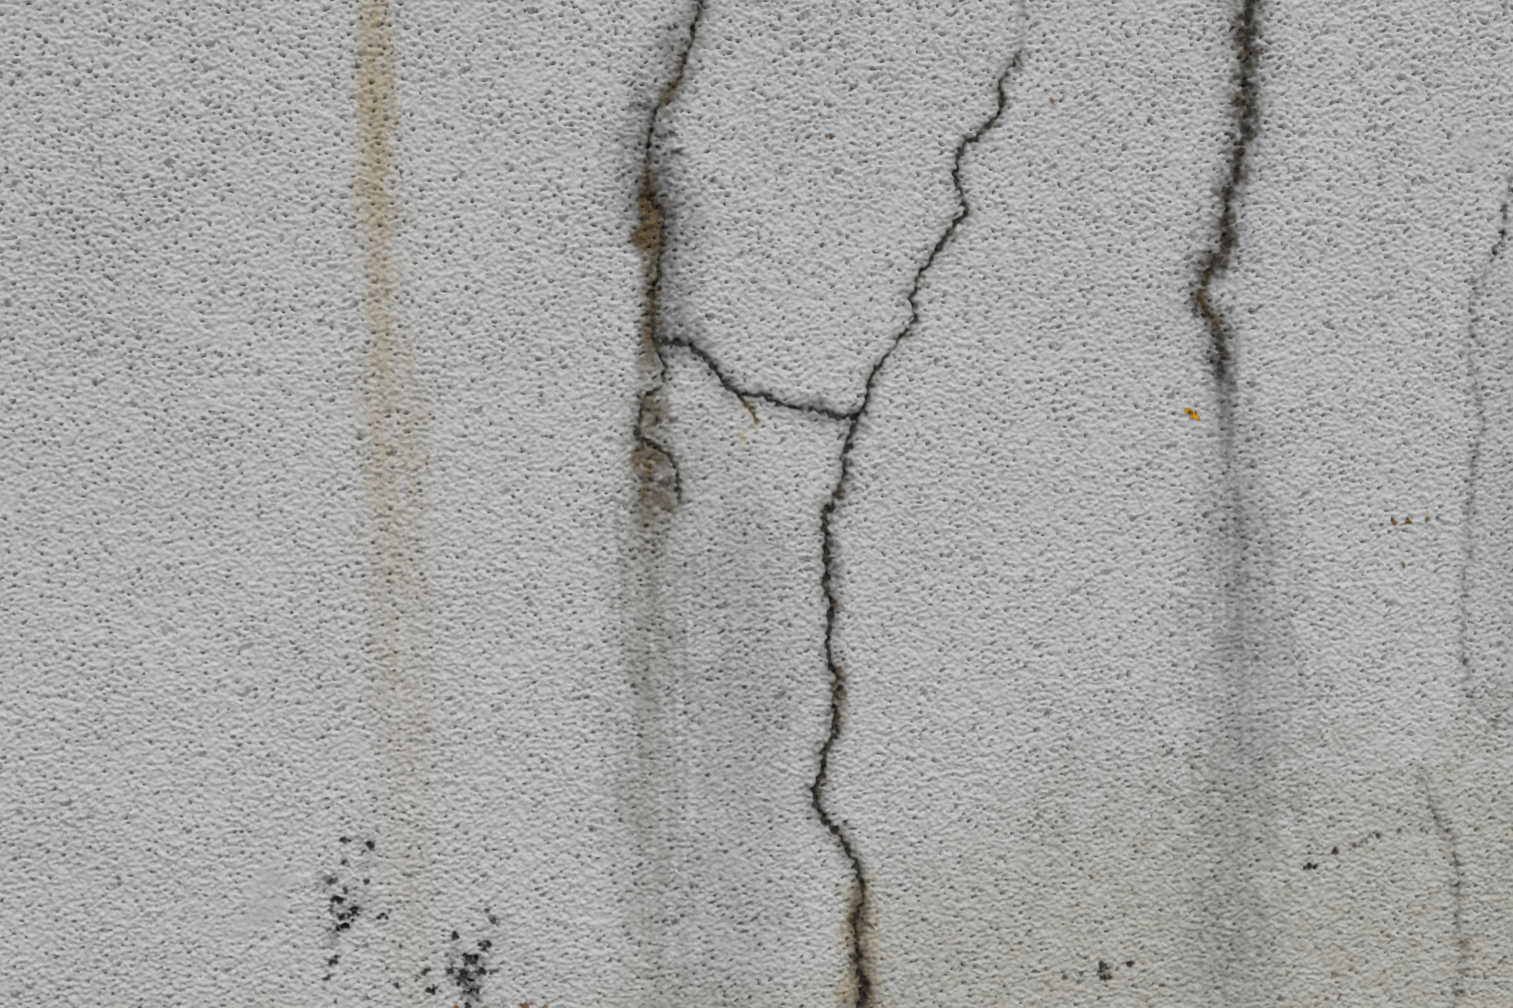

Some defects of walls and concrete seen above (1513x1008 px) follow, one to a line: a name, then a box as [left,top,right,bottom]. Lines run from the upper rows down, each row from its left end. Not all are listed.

crack [1189,0,1259,375]
crack [629,7,1015,1008]
mould [327,878,388,931]
mould [421,909,498,1008]